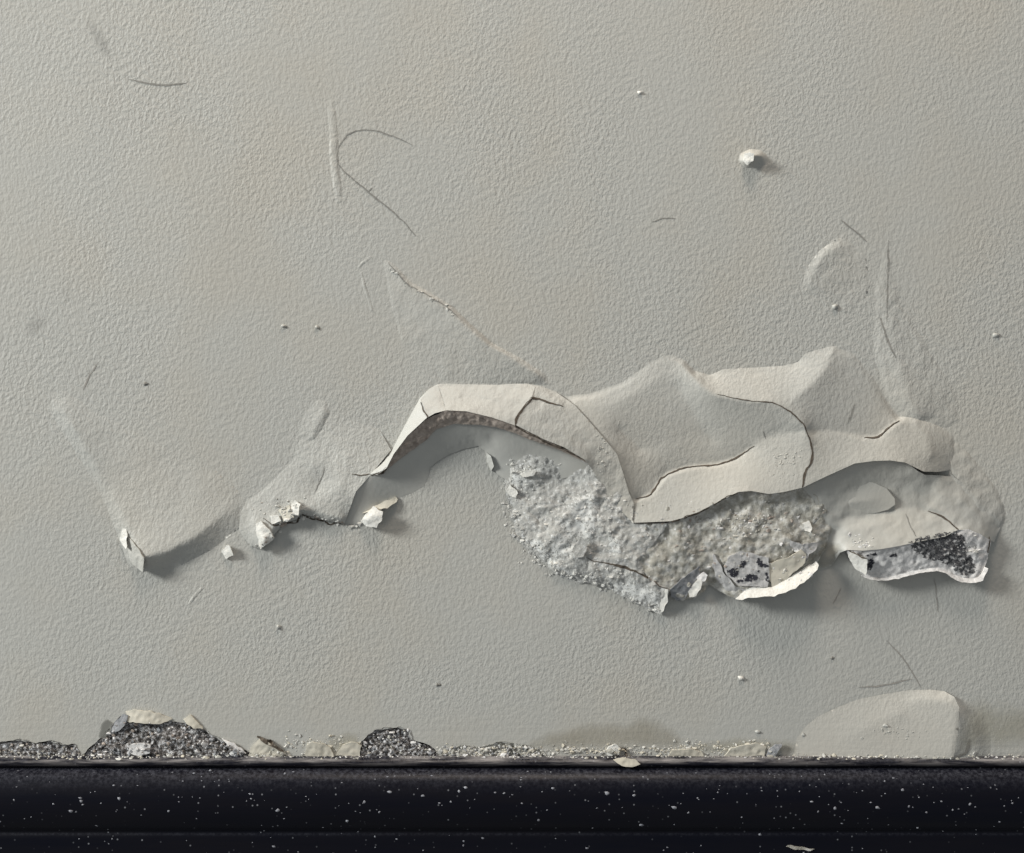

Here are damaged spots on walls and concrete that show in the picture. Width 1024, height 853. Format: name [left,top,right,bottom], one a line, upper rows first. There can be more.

crack [337,129,416,236]
peeling [239,383,1000,613]
peeling [221,545,234,559]
flaking render [0,710,1024,767]